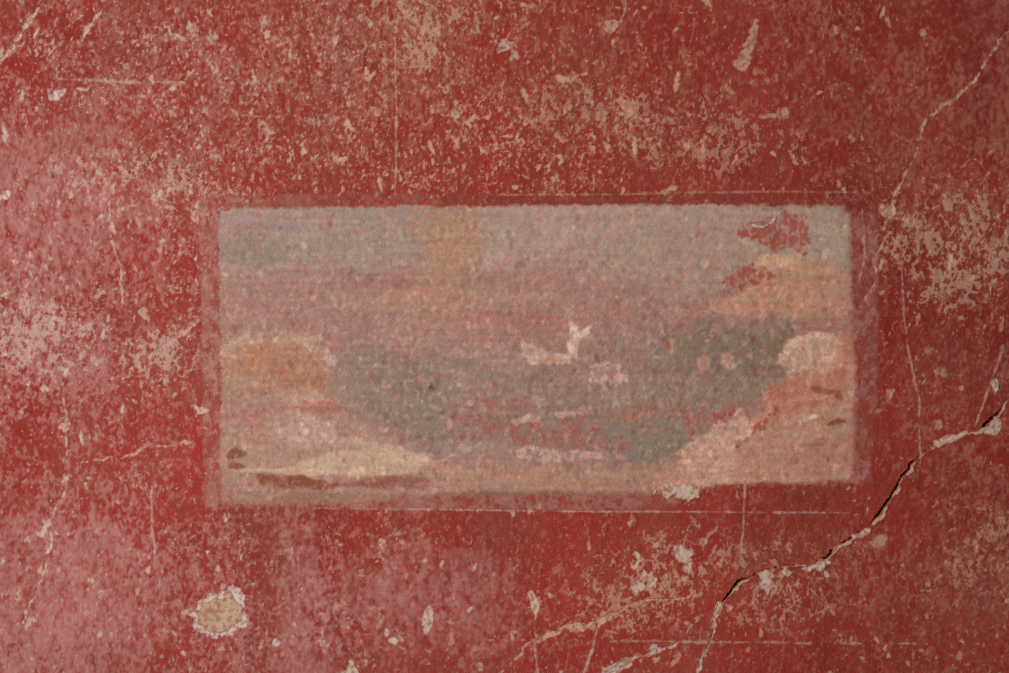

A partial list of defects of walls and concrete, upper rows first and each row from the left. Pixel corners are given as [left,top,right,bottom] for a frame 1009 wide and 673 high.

crack [0,0,44,62]
crack [79,0,107,48]
crack [496,377,1009,673]
spalling [180,584,253,652]